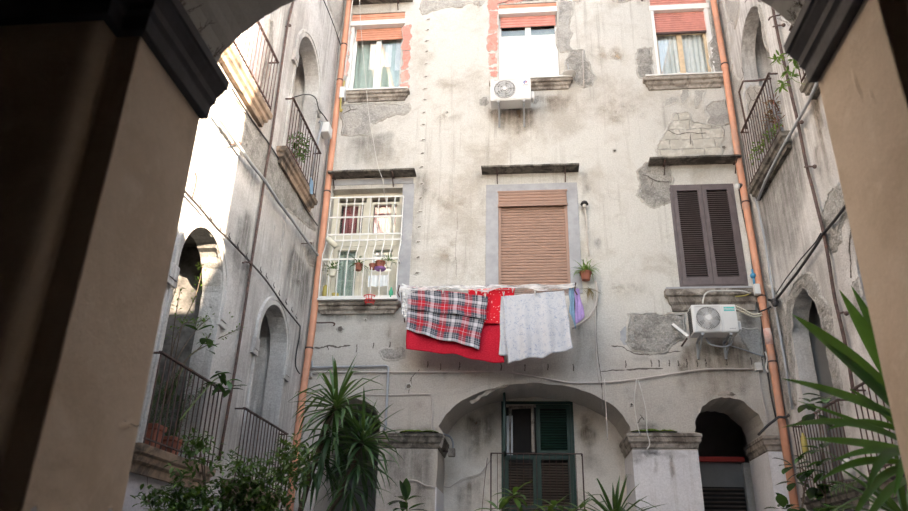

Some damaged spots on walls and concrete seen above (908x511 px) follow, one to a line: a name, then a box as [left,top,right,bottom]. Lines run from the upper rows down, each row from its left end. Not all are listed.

flaking render [327,0,352,76]
peeling [400,24,413,89]
peeling [419,0,527,126]
flaking render [555,0,597,89]
flaking render [340,102,411,137]
flaking render [635,0,835,422]
flaking render [822,182,847,255]
flaking render [625,311,687,355]
flaking render [826,347,843,406]